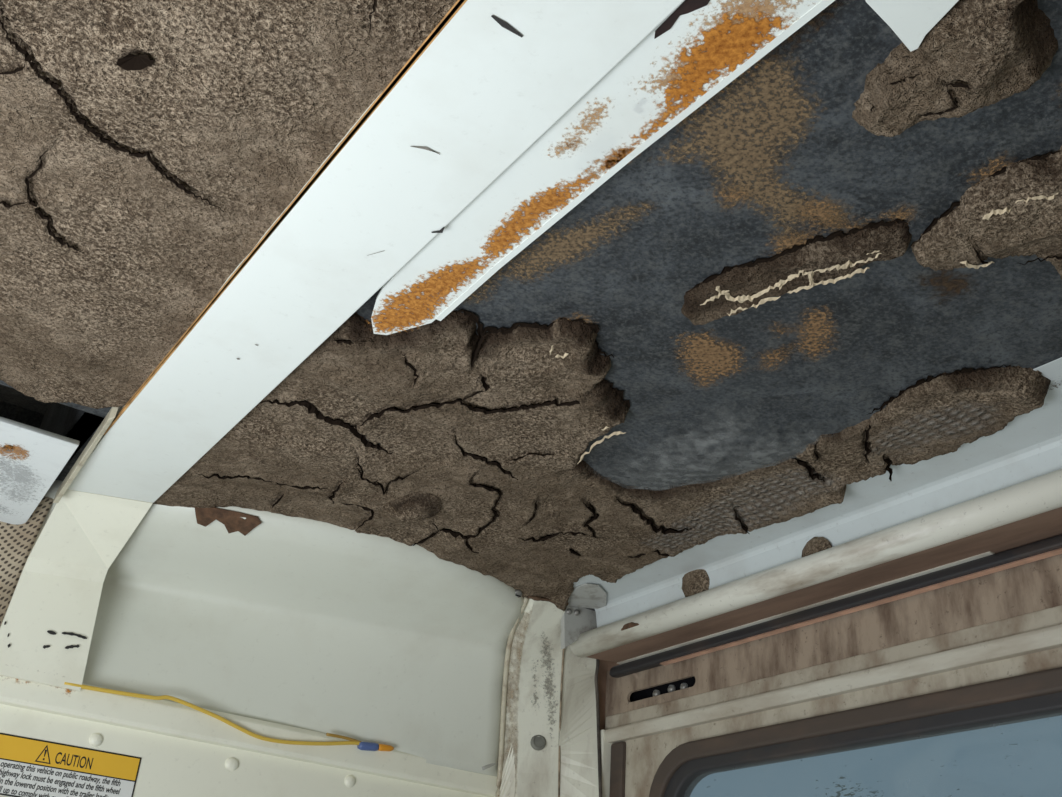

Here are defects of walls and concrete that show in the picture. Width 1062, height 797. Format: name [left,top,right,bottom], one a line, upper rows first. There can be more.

peeling [654,0,710,39]
crack [0,6,224,212]
crack [0,144,83,253]
corrosion [368,0,802,333]
peeling [982,193,1058,220]
peeling [701,251,882,316]
corrosion [0,445,29,460]
crack [198,331,603,531]
crack [413,431,553,553]
peeling [577,426,624,464]
crack [521,498,692,558]
leakage [533,641,558,724]